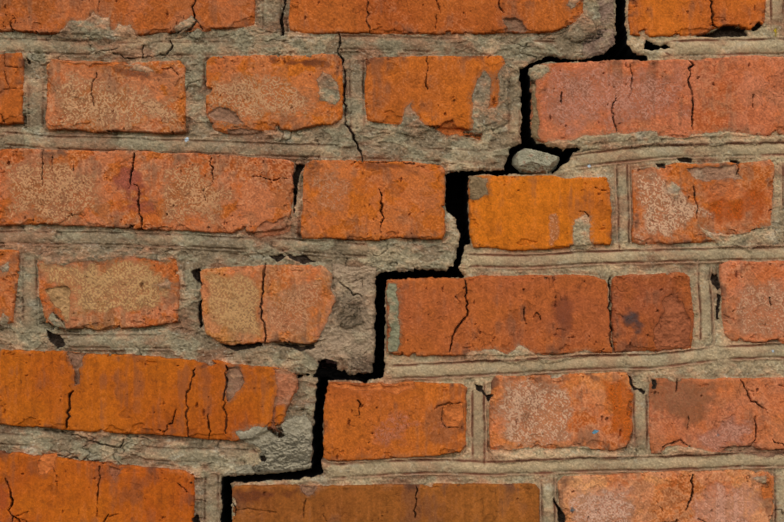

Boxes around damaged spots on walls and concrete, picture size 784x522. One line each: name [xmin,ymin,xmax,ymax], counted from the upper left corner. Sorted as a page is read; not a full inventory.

crack [686,62,694,121]
spalling [436,120,481,140]
crack [220,0,670,522]
spalling [45,286,71,321]
crack [208,365,228,434]
spalling [226,366,244,402]